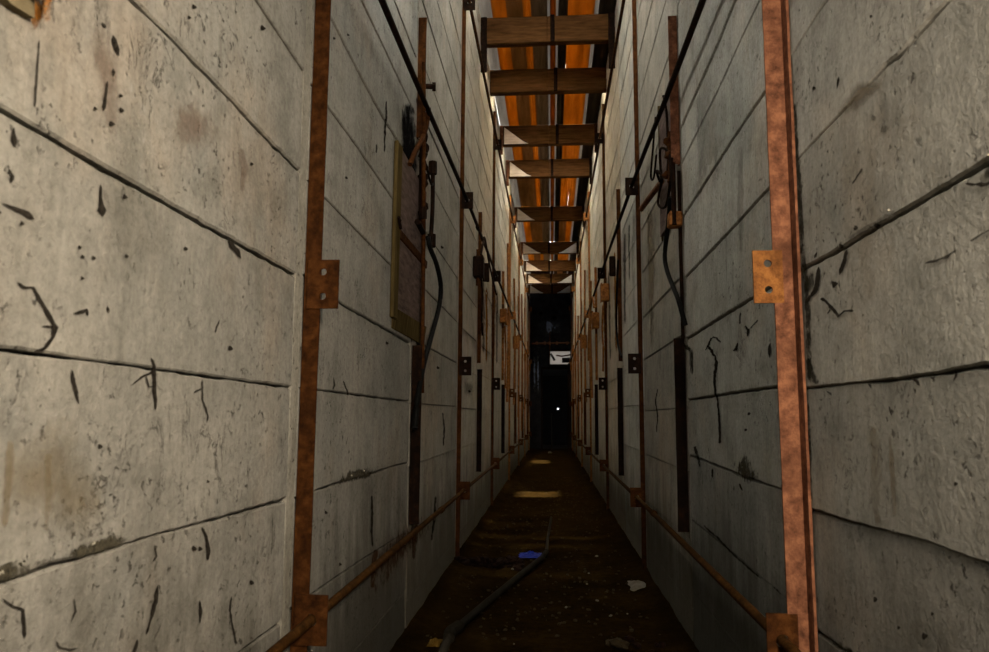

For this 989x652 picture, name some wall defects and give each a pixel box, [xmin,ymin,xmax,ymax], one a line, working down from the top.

crack [965,167,989,187]
crack [804,226,858,318]
crack [18,282,59,353]
crack [71,370,79,403]
crack [705,313,771,443]
spalling [62,536,125,559]
spalling [0,560,45,581]
spalling [3,599,26,637]